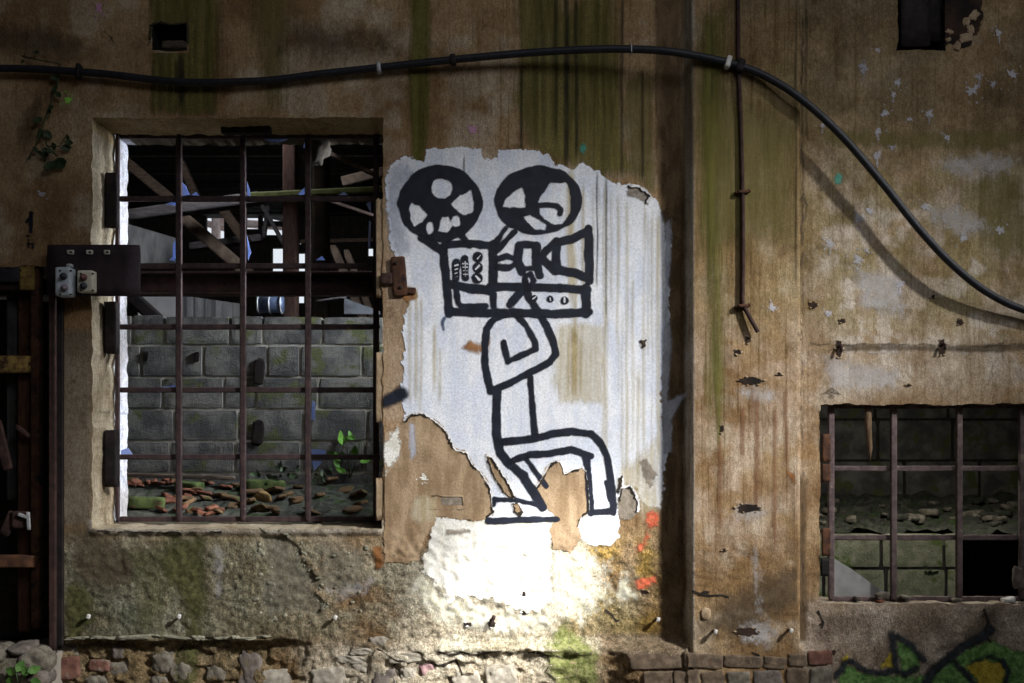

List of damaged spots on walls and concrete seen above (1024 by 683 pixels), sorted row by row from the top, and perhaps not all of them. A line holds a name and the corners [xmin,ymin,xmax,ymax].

flaking render [945,0,984,51]
leakage [556,0,578,163]
spalling [737,372,784,386]
rust [774,420,795,487]
peeling [383,411,525,564]
peeling [535,458,590,553]
spalling [733,503,763,513]